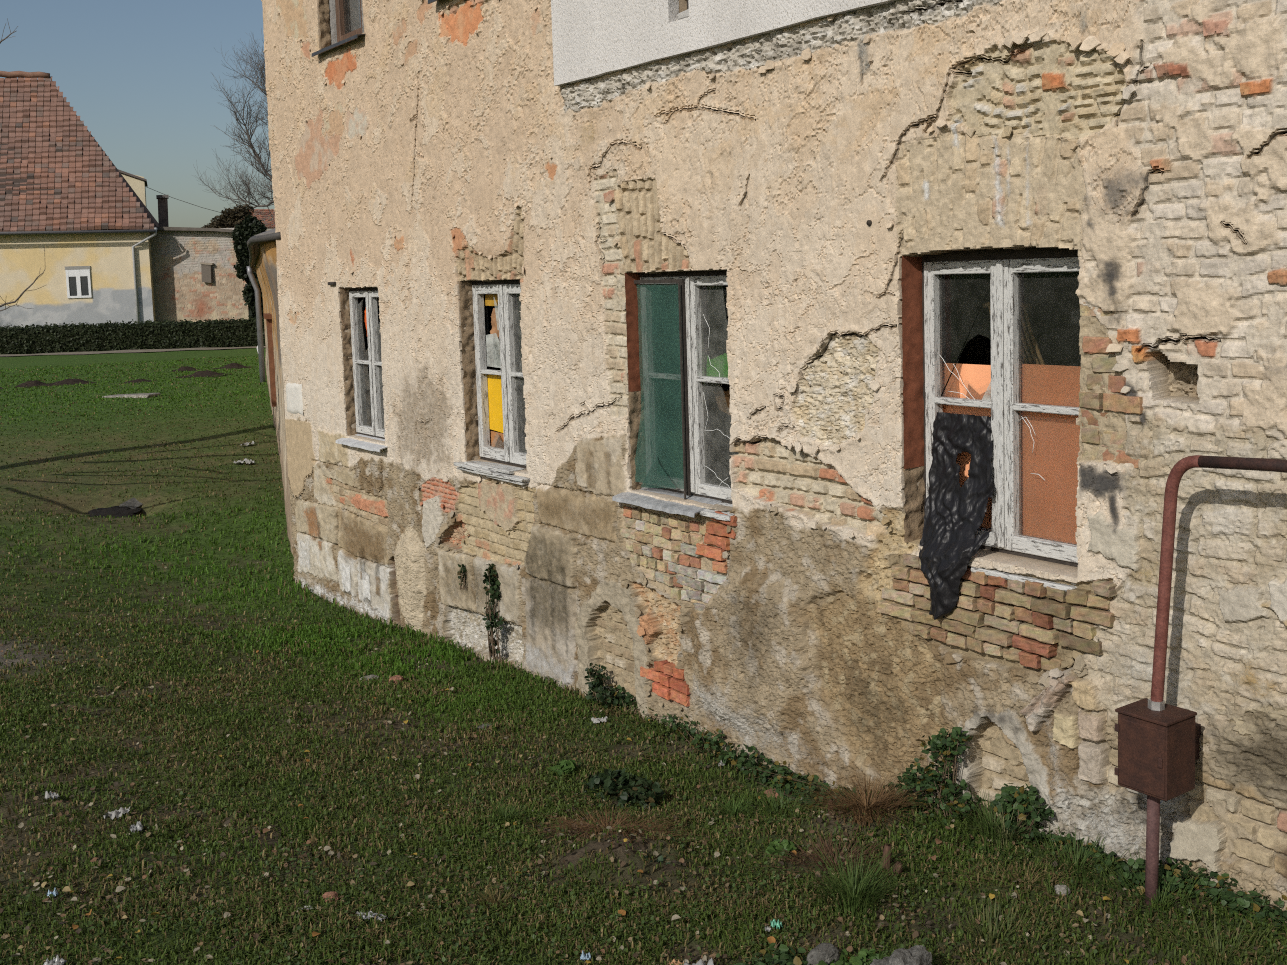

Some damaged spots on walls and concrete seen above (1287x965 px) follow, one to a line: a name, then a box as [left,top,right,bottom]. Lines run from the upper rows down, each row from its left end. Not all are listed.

crack [656,89,756,125]
crack [880,43,1035,181]
flaking render [866,27,1136,257]
crack [1113,42,1149,125]
crack [1247,129,1287,159]
flaking render [452,203,525,282]
flaking render [605,179,691,273]
crack [1131,167,1165,217]
flaking render [1078,302,1200,474]
crack [1137,334,1221,353]
flaking render [734,334,892,538]
flaking render [618,502,737,711]